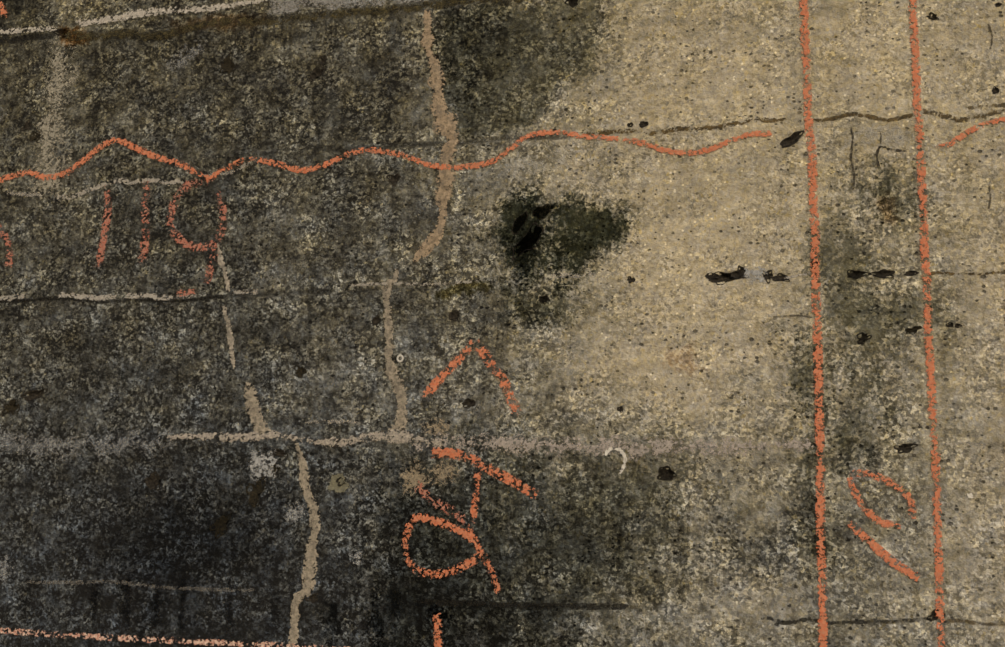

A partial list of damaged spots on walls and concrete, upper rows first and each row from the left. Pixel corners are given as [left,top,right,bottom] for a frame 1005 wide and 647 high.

crack [0,0,523,441]
water stain [489,189,630,289]
crack [288,442,321,647]
water stain [167,418,813,494]